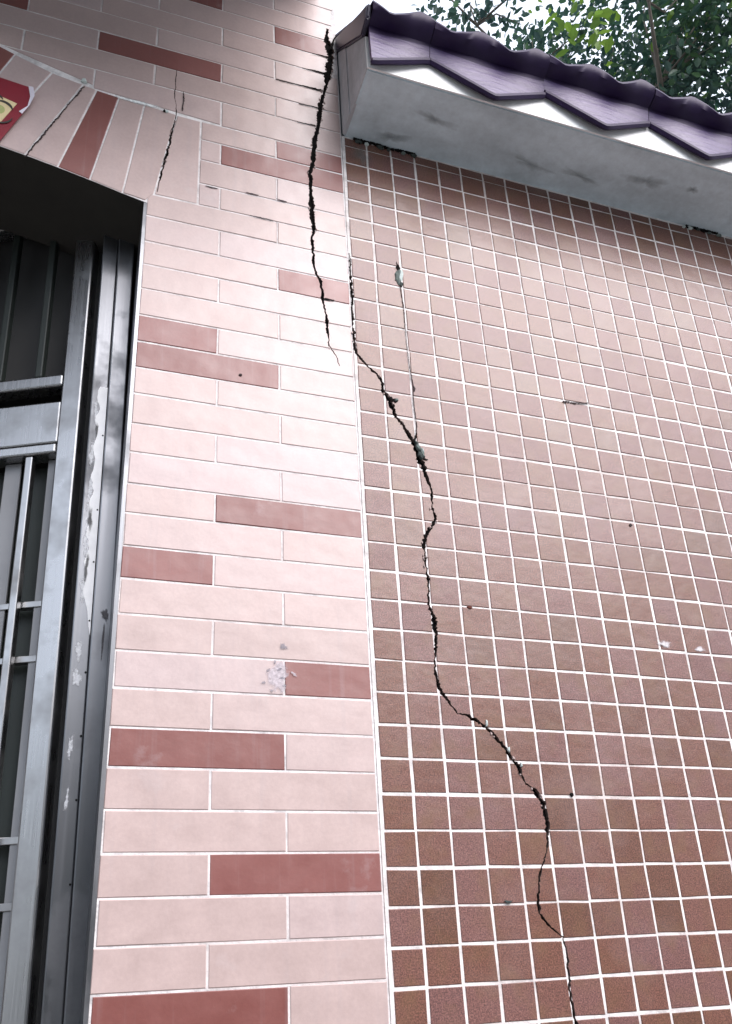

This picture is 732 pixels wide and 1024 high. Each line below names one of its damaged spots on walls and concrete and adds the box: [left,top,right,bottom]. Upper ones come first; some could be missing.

crack [24,86,85,157]
crack [157,79,185,192]
crack [276,32,360,359]
crack [378,262,548,847]
spalling [262,660,296,692]